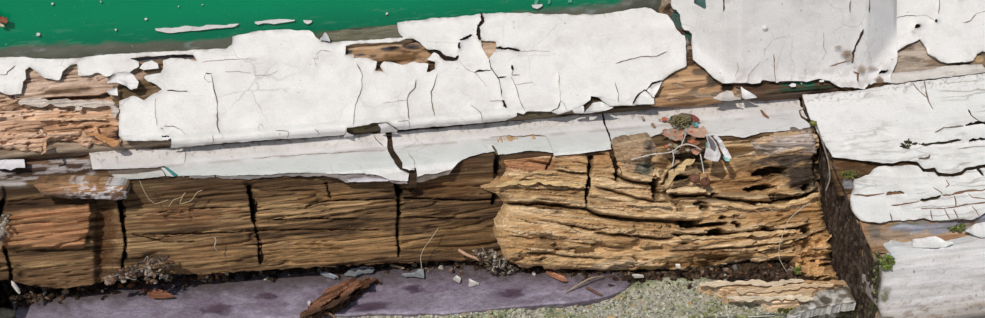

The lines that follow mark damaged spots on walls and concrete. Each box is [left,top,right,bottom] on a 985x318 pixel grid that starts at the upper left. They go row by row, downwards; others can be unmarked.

peeling [14,51,196,105]
crack [155,58,275,162]
crack [254,63,415,167]
crack [117,135,553,268]
peeling [344,123,417,189]
crack [387,13,565,128]
crack [584,52,665,208]
peeling [572,3,852,116]
peeling [826,156,924,196]
crack [822,0,985,220]
peeling [858,213,985,253]
peeling [892,40,985,73]